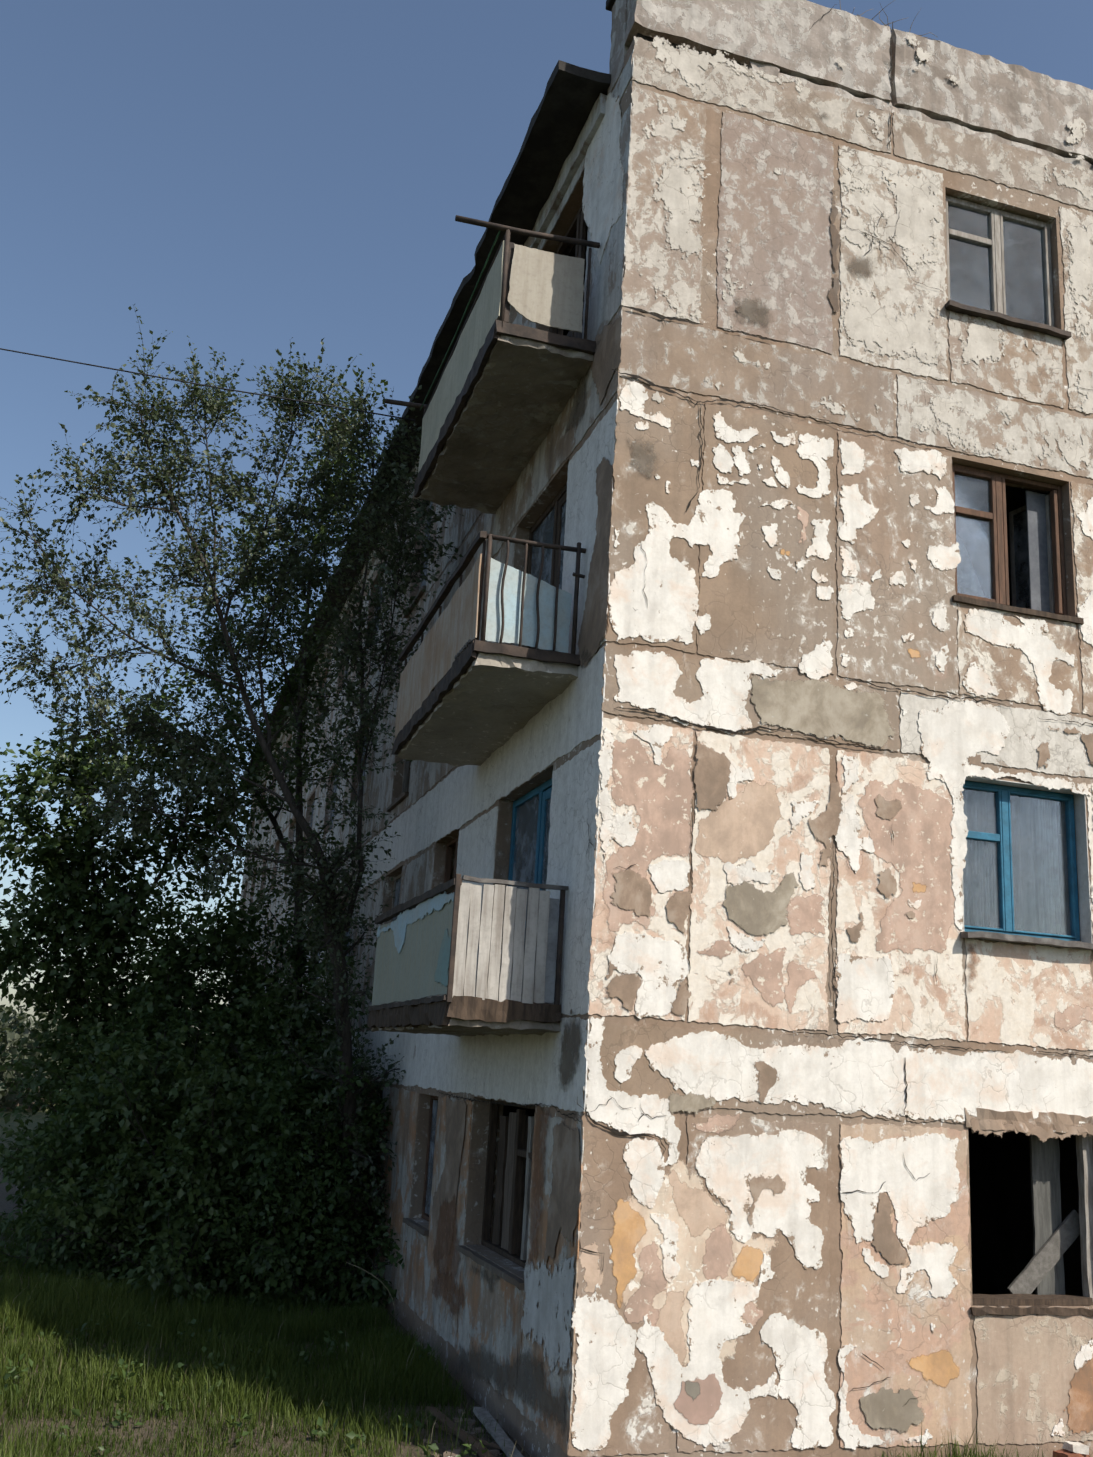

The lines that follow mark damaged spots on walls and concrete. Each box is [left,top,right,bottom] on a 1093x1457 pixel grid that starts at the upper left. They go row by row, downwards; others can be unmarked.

peeling [582,92,624,264]
peeling [643,99,707,260]
peeling [649,36,803,98]
peeling [856,110,885,141]
crack [887,22,895,149]
peeling [1045,117,1093,200]
peeling [1065,224,1093,336]
flaking render [591,313,671,430]
peeling [724,346,770,369]
peeling [1075,370,1093,414]
peeling [521,394,1093,1451]
water stain [458,1345,566,1430]